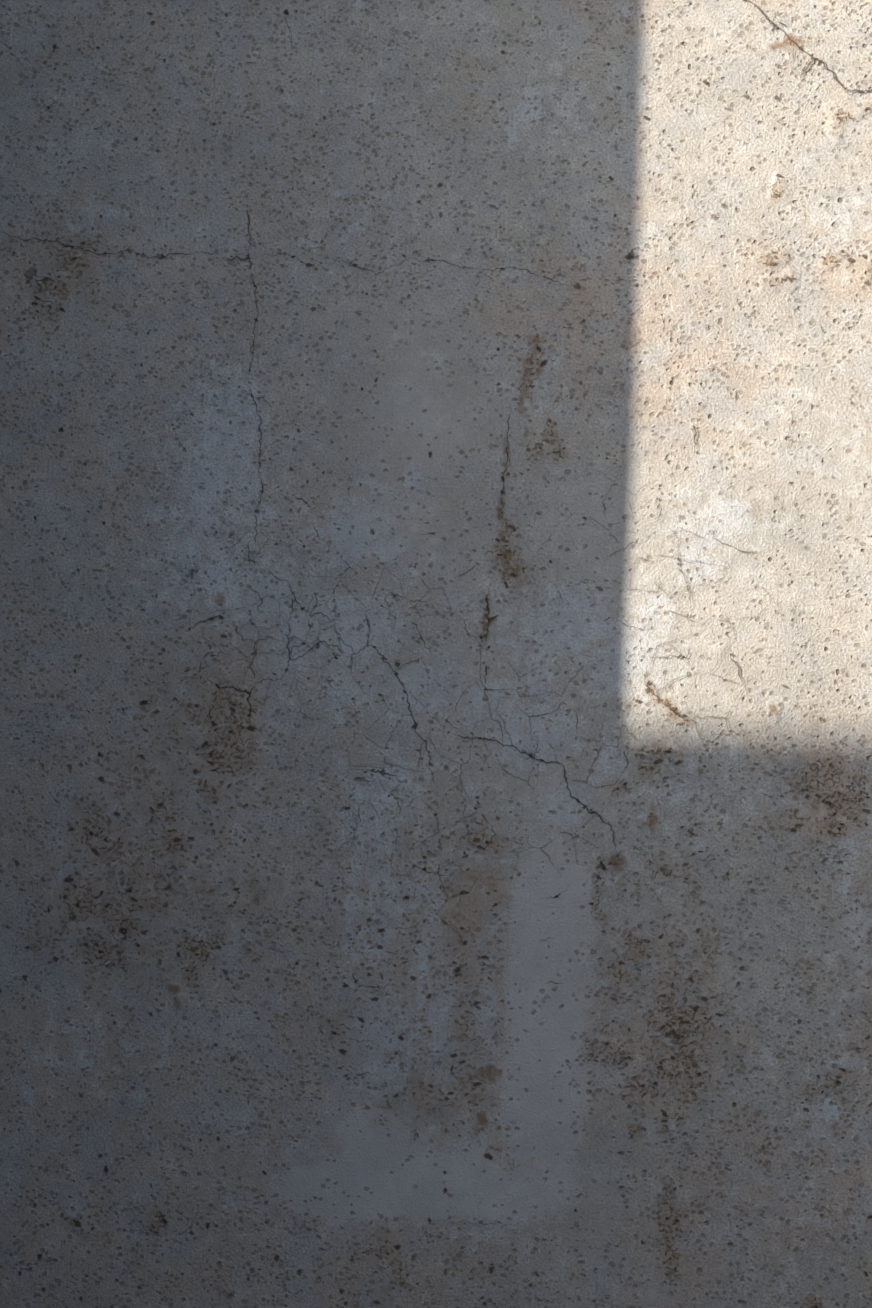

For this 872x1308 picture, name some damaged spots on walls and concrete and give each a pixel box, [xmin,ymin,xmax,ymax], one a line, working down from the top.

crack [746,0,872,95]
crack [13,210,635,860]
water stain [153,349,762,837]
rust [485,409,523,653]
crack [583,498,660,557]
crack [645,653,747,731]